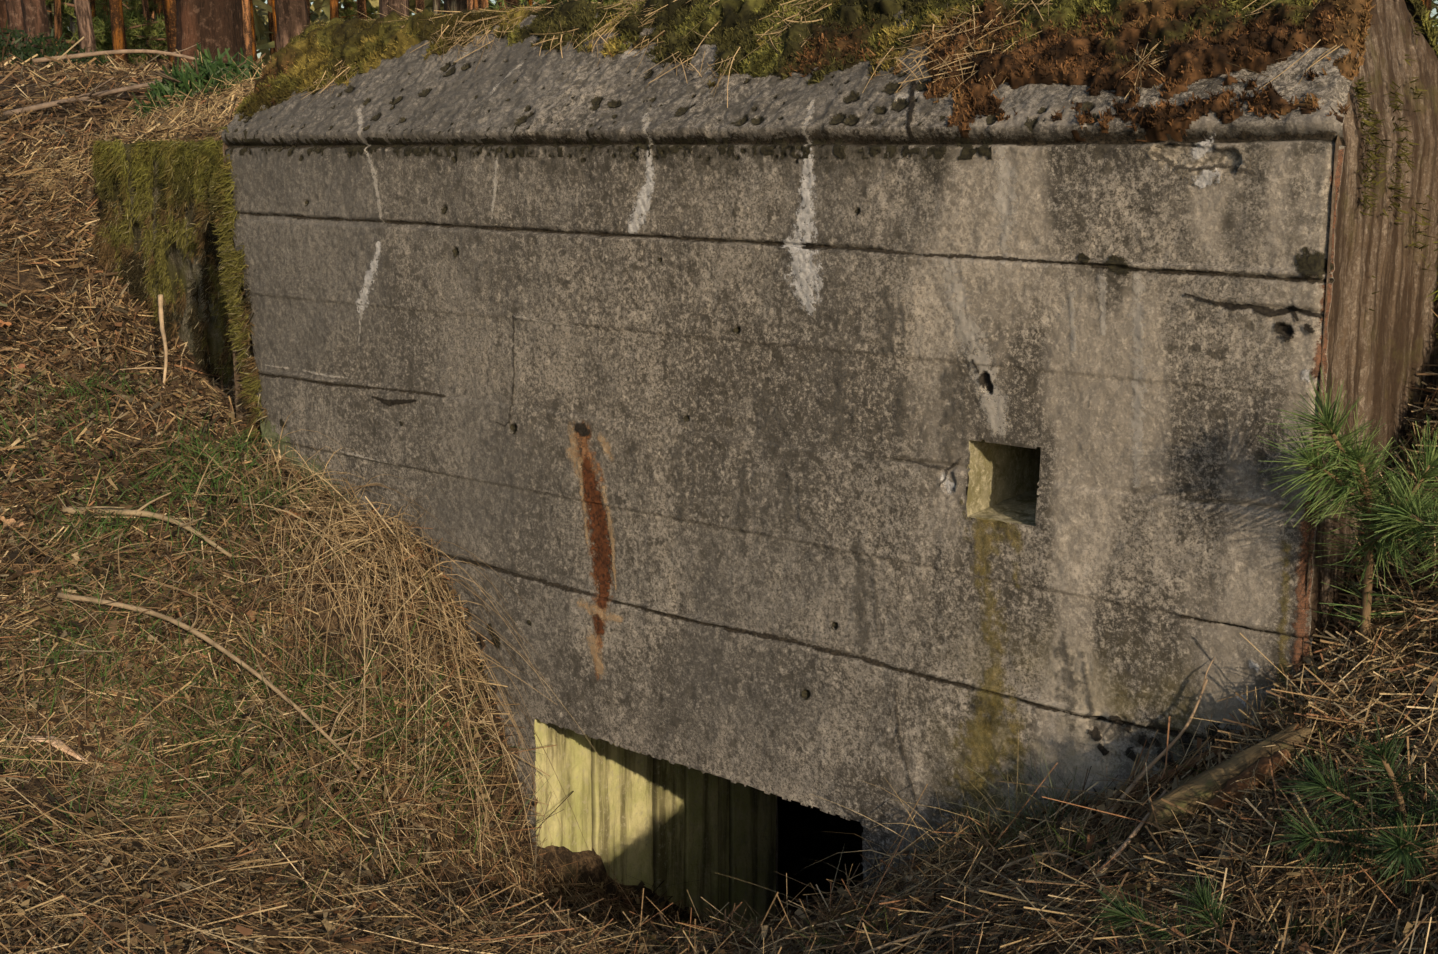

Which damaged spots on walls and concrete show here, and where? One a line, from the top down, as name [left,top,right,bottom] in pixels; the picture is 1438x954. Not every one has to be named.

water stain [356,108,384,224]
water stain [628,113,655,234]
water stain [782,100,824,315]
water stain [356,241,381,341]
corrosion [567,421,623,680]